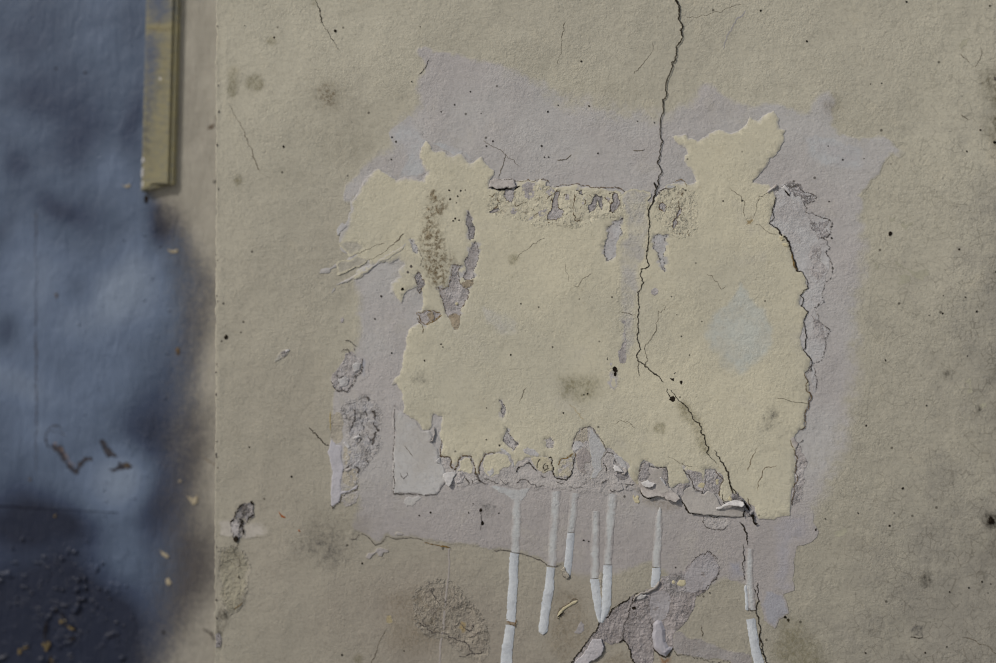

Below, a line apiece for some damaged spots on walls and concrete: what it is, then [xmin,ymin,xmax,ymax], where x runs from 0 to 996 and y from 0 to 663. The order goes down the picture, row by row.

peeling [215,501,255,619]
peeling [330,212,789,663]
peeling [342,45,905,531]
crack [622,0,776,663]
crack [731,189,812,430]